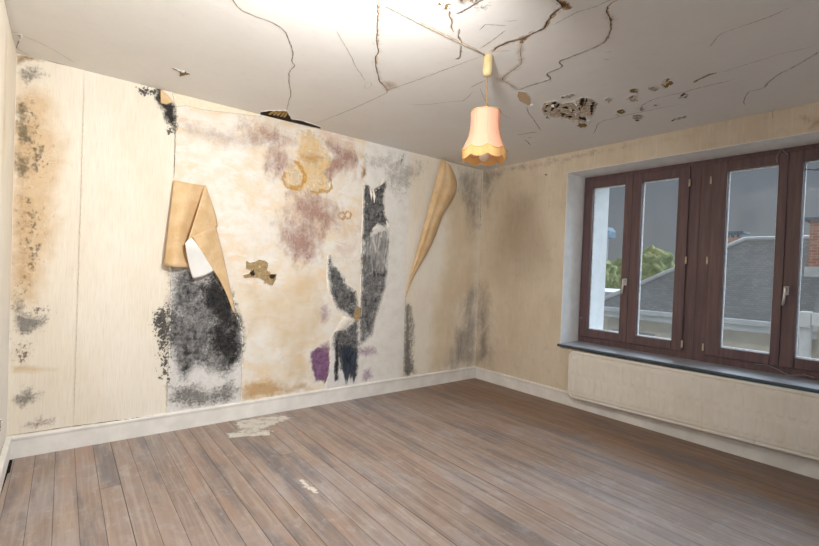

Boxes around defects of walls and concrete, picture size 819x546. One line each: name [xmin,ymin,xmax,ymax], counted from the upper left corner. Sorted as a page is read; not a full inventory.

water stain [17,103,48,175]
water stain [139,86,177,135]
crack [233,0,295,107]
spalling [259,110,322,129]
crack [320,0,617,122]
spalling [516,90,613,128]
spalling [616,77,675,121]
crack [593,47,819,134]
water stain [276,131,357,228]
water stain [17,197,45,334]
spalling [242,259,277,286]
water stain [311,347,330,383]